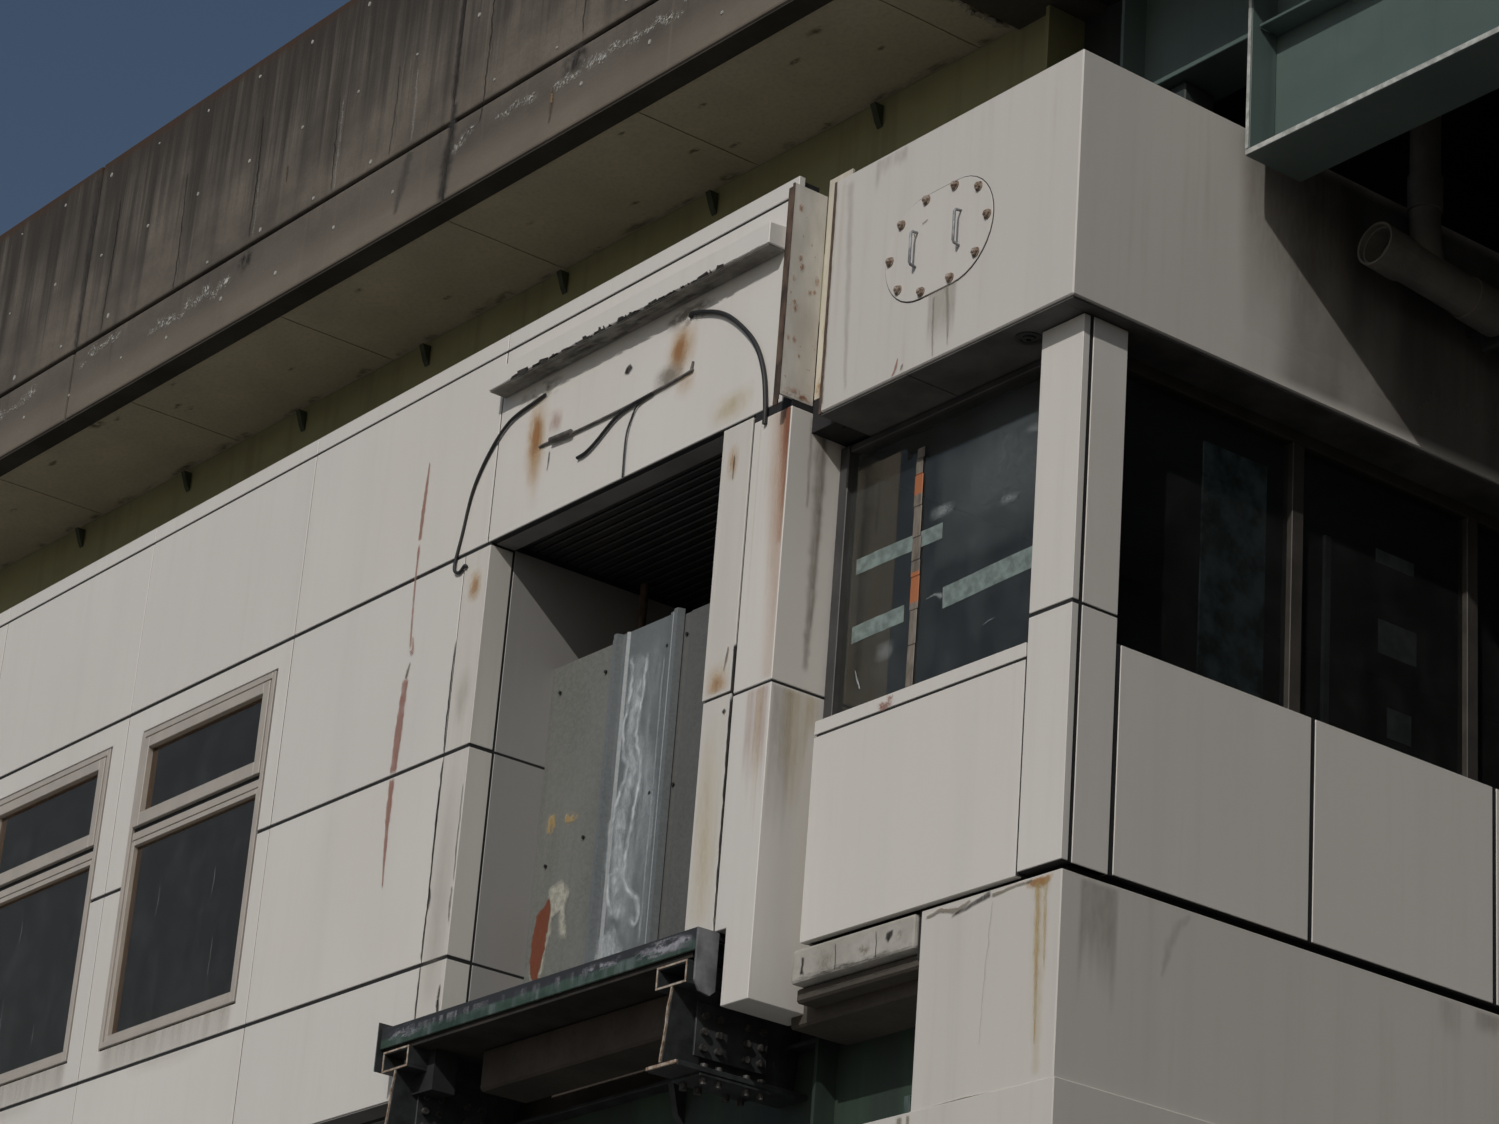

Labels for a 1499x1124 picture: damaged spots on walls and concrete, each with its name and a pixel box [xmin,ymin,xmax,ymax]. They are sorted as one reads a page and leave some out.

leakage [438,0,473,198]
peeling [510,264,724,380]
corrosion [661,332,688,384]
corrosion [529,416,542,460]
corrosion [382,464,430,886]
leakage [606,659,648,925]
corrosion [1030,875,1049,988]